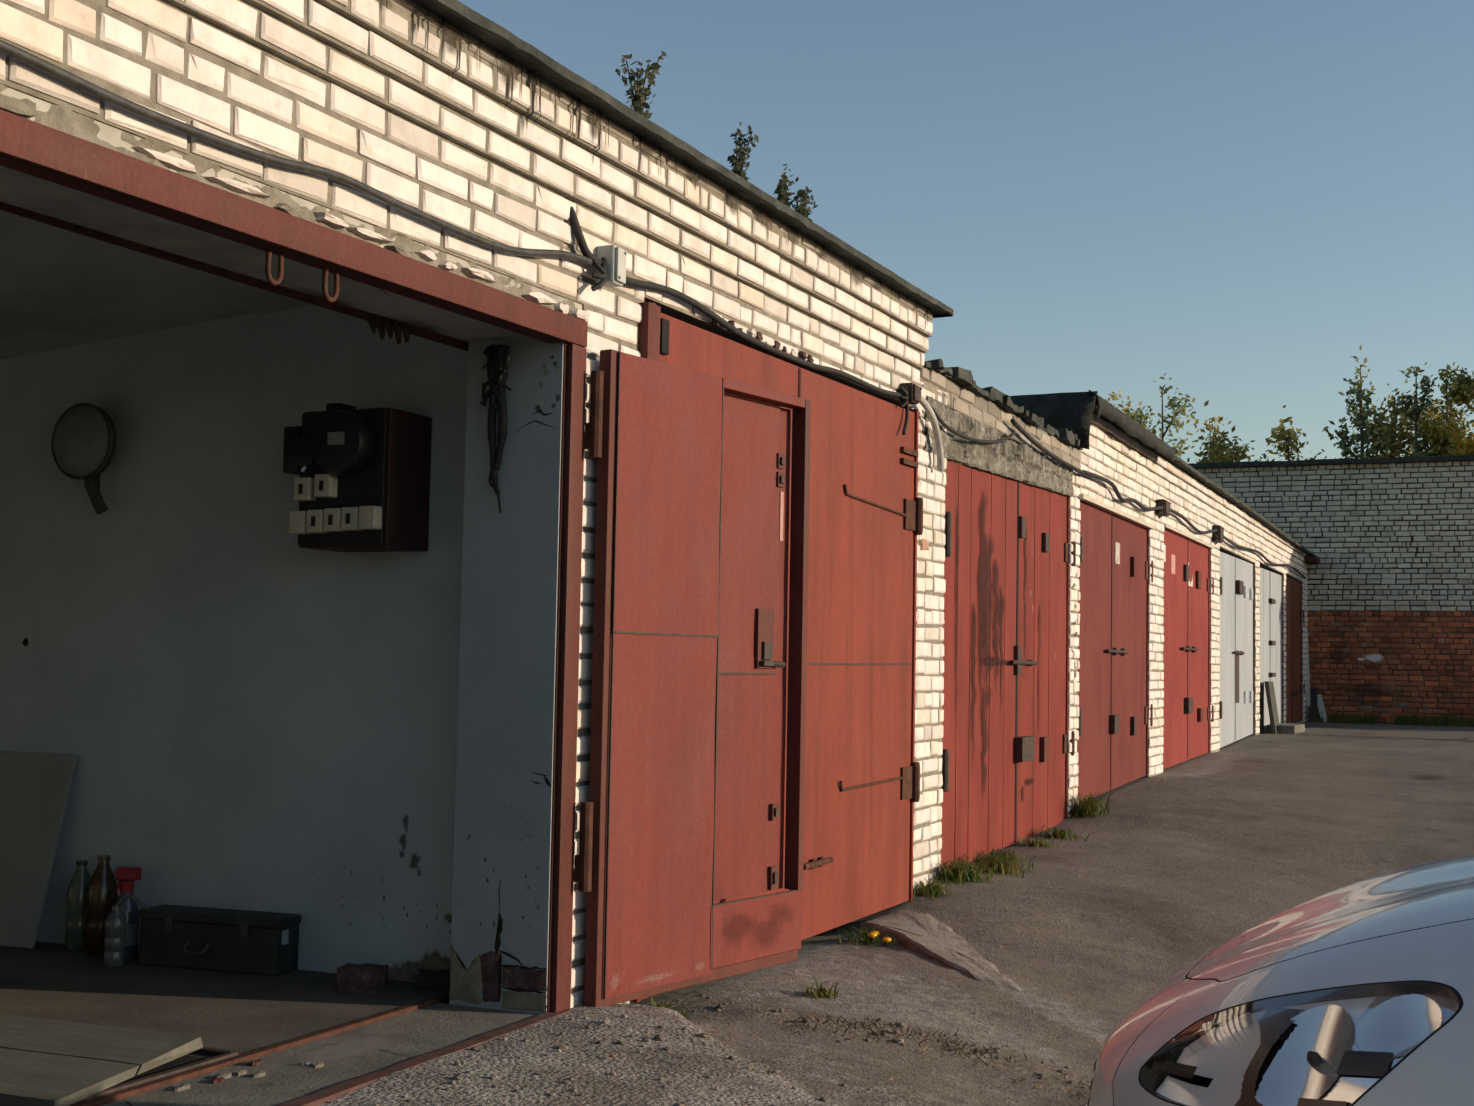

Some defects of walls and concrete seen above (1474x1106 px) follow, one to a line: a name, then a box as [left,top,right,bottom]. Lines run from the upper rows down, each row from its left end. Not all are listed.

peeling [399,816,421,875]
flaking render [388,888,547,1012]